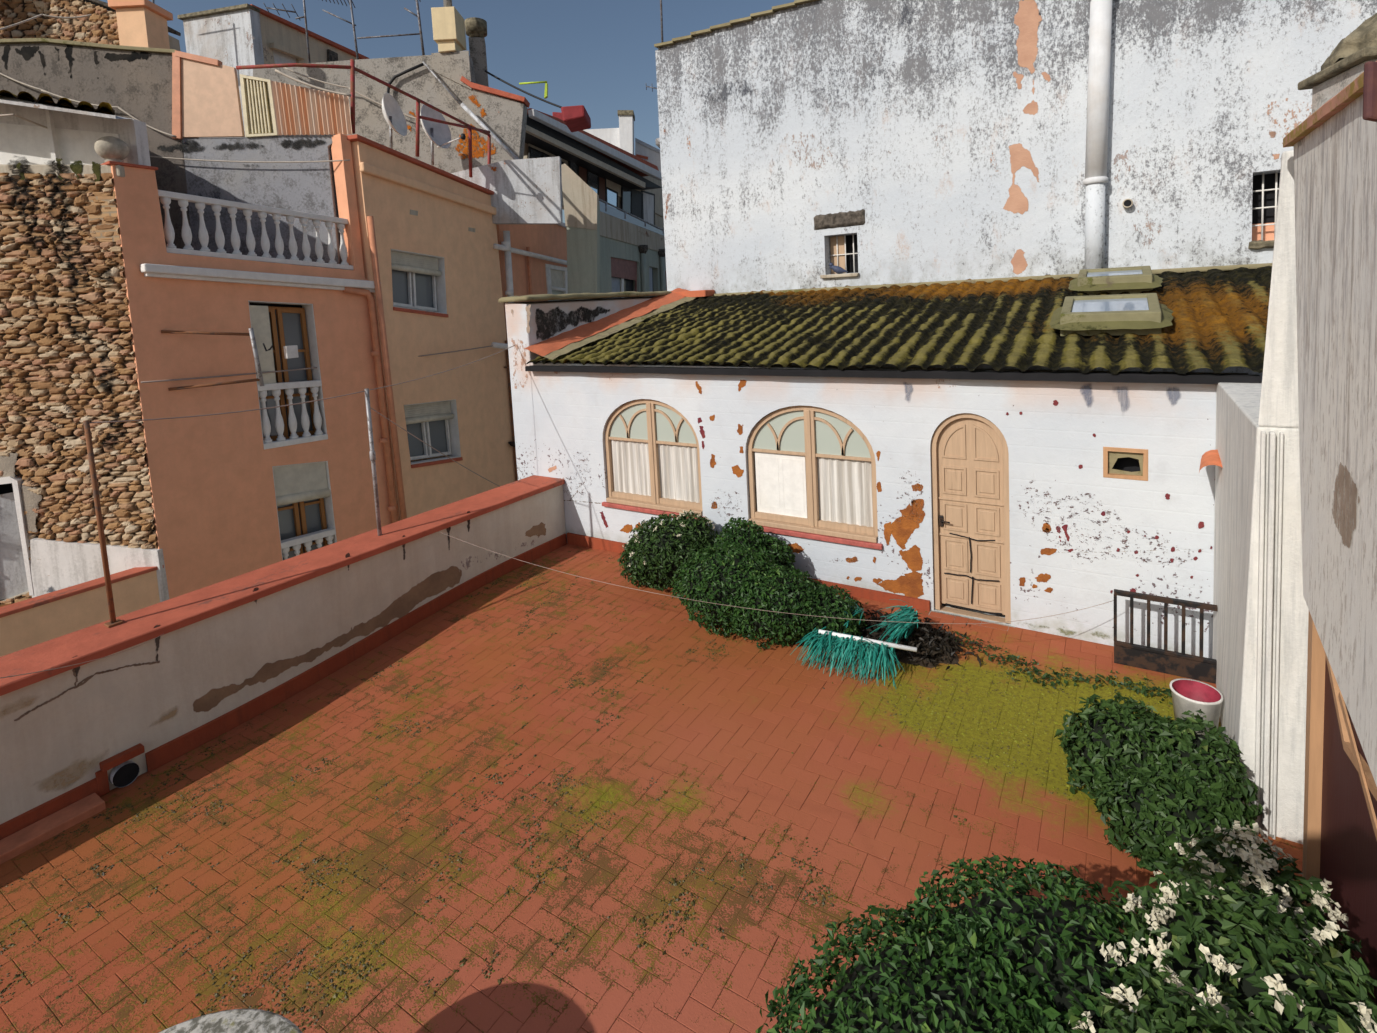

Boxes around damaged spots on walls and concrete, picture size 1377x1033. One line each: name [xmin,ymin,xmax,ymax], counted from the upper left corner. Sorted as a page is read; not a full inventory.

water stain [1,45,74,81]
water stain [94,51,151,79]
peeling [1013,0,1051,115]
water stain [5,156,114,293]
peeling [999,249,1028,275]
peeling [990,143,1039,215]
water stain [511,305,610,340]
water stain [69,321,126,450]
spalling [698,415,744,520]
peeling [835,470,925,598]
water stain [193,511,470,713]
crack [14,660,160,721]